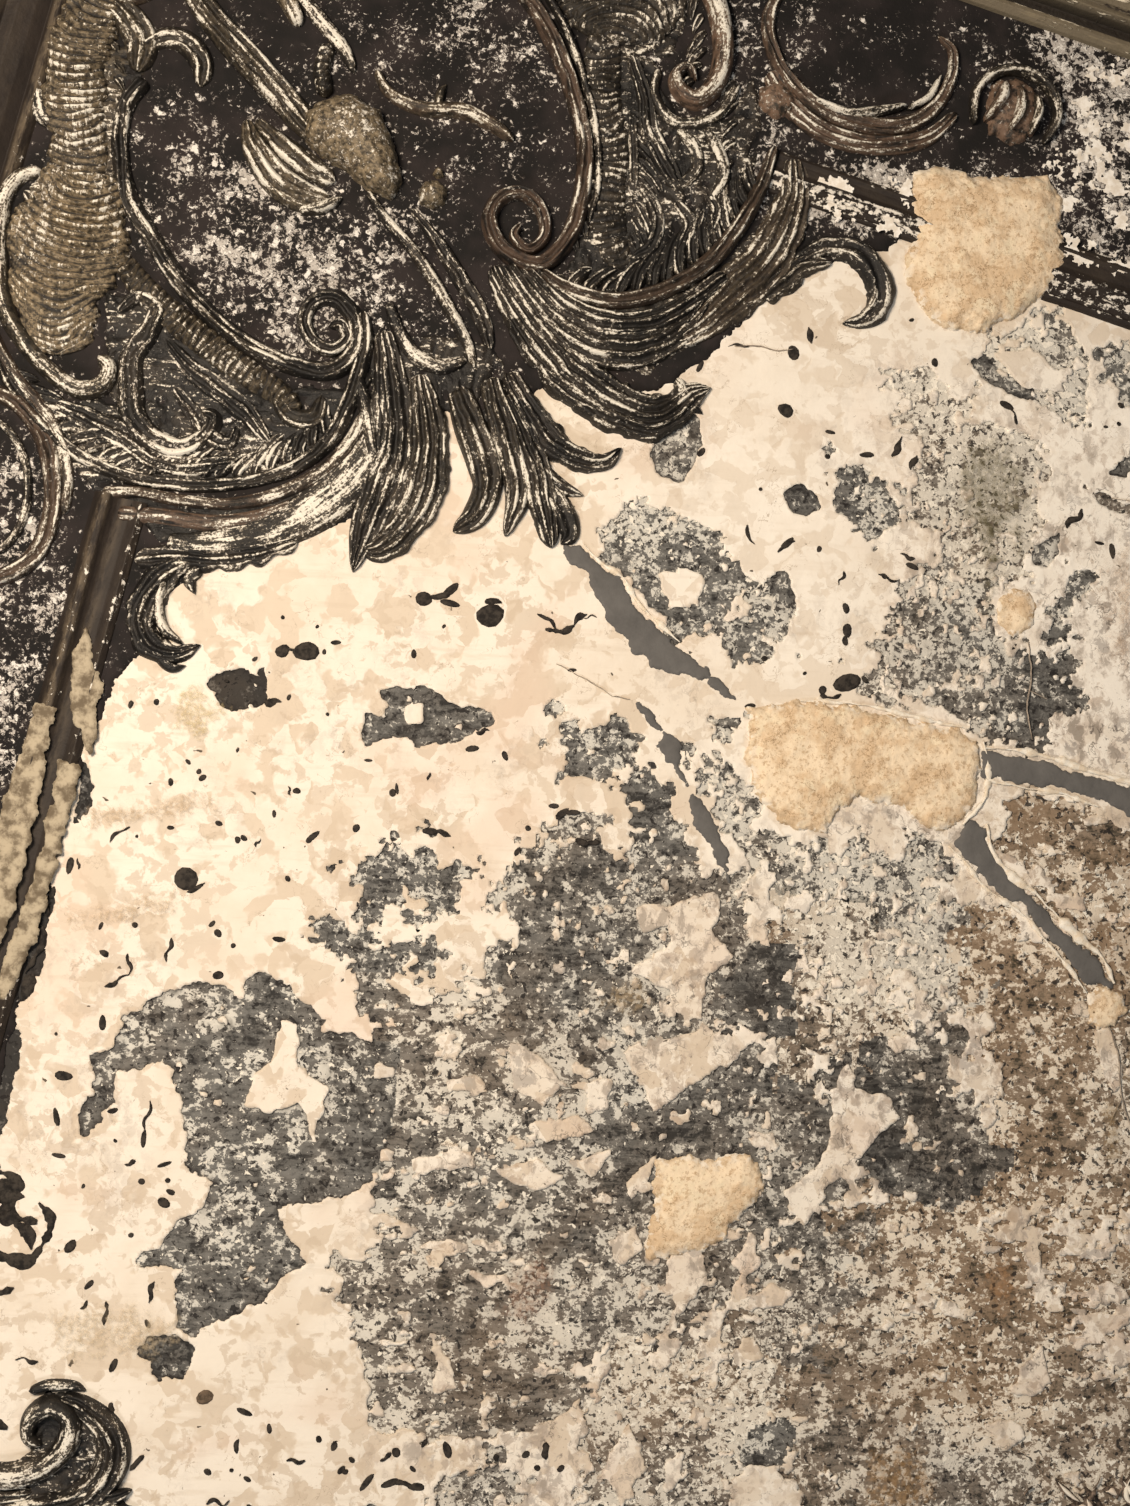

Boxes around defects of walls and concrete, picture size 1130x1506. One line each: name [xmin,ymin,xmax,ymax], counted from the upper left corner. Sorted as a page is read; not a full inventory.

peeling [650,414,705,483]
spalling [778,403,793,418]
crack [563,544,736,700]
peeling [596,496,796,669]
peeling [783,306,1130,758]
peeling [361,685,495,762]
crack [557,664,730,883]
crack [800,641,1130,994]
peeling [78,699,1042,1506]
crack [1109,1027,1130,1125]
peeling [1105,1320,1130,1344]